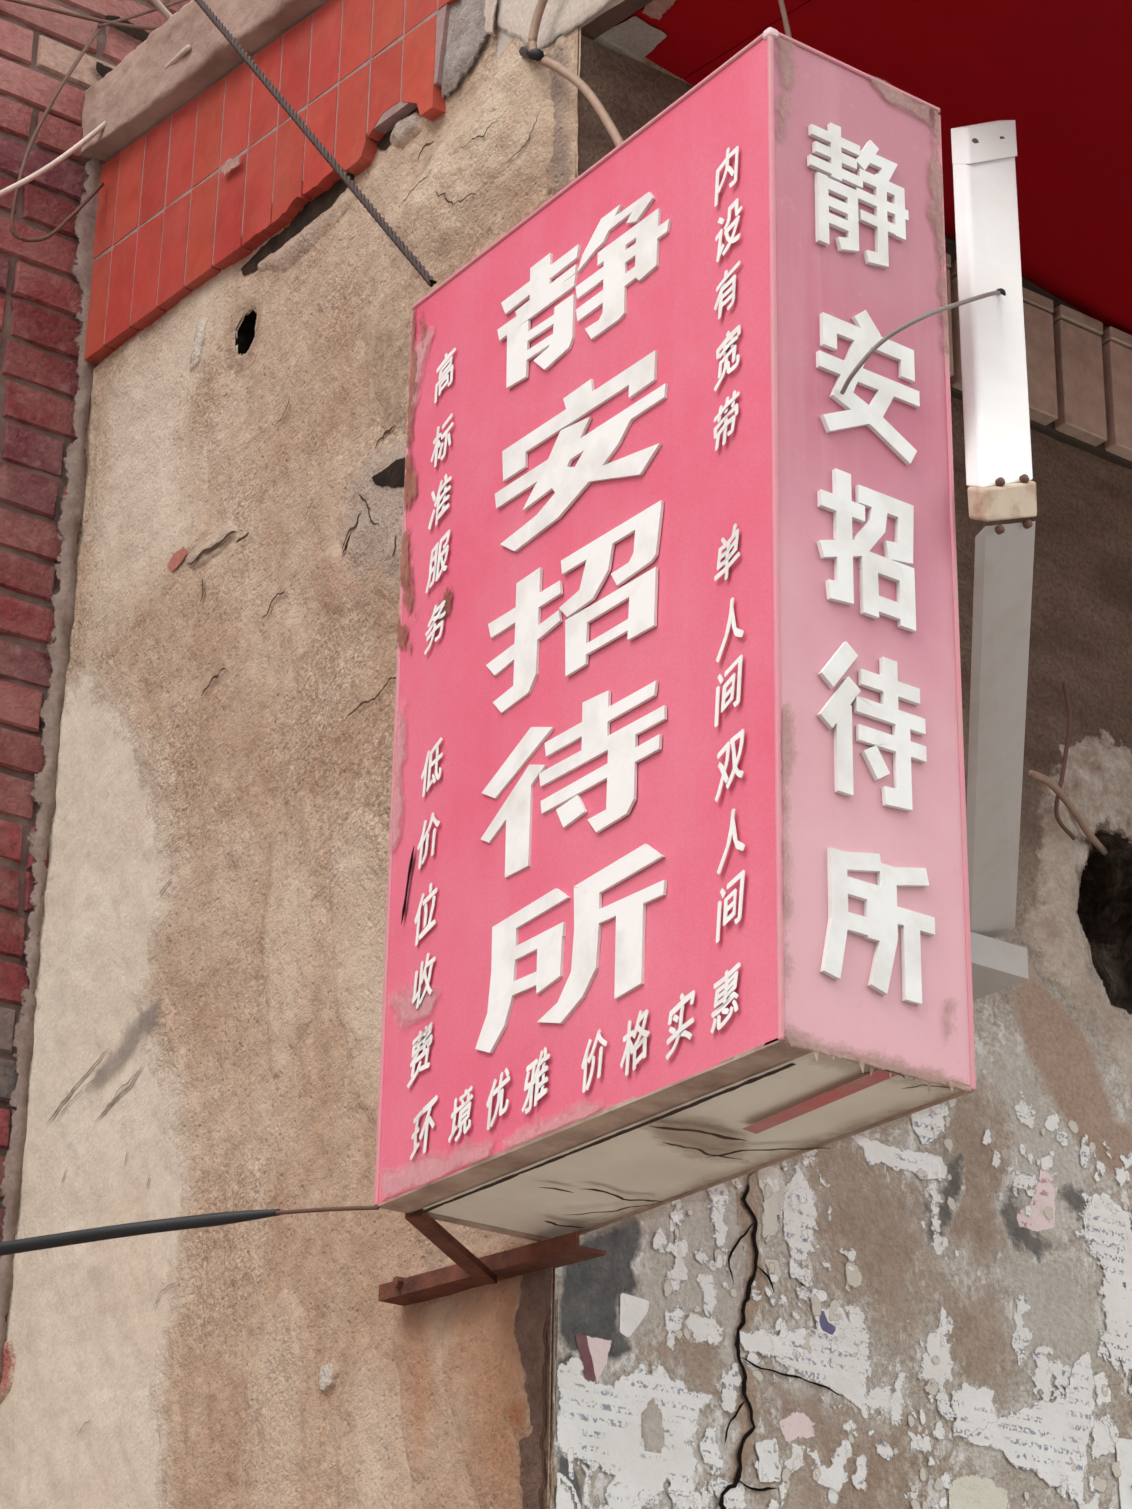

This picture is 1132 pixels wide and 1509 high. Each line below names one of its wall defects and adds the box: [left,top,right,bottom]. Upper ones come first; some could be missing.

spalling [241,172,354,275]
spalling [224,293,265,374]
flaking render [310,294,424,617]
crack [200,668,226,696]
crack [330,672,396,721]
spalling [1007,725,1132,1189]
rust [466,1234,538,1258]
flaking render [792,1069,1023,1416]
rust [393,1275,558,1509]
flaking render [634,1312,737,1407]
crack [719,1170,842,1509]
flaking render [739,1364,927,1509]